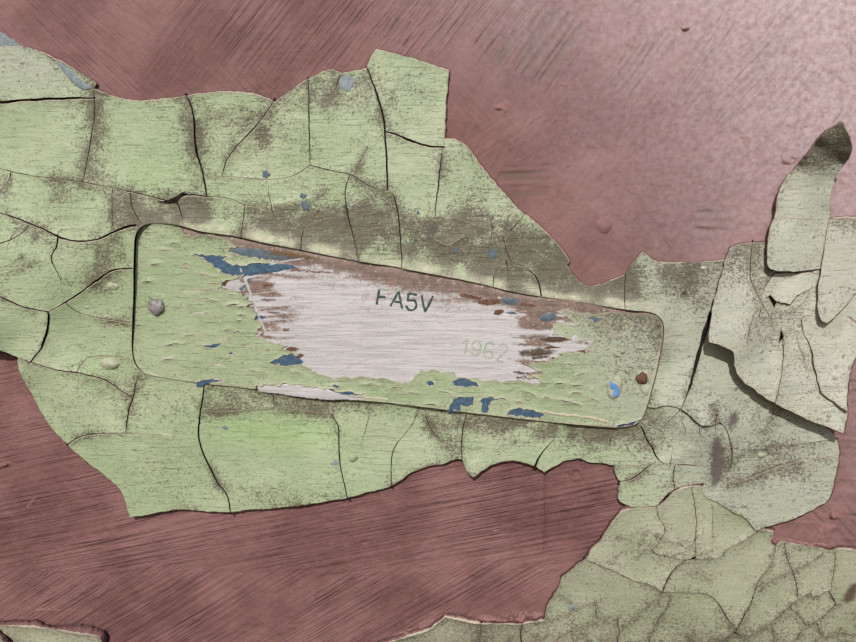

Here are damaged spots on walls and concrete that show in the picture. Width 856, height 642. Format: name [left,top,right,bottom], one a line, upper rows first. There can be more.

crack [345,68,445,267]
crack [0,93,325,434]
peeling [0,32,856,531]
crack [198,385,232,515]
crack [330,413,350,500]
crack [391,407,466,488]
crack [580,427,696,490]
crack [678,301,733,466]
peeling [0,619,107,642]
peeling [377,484,856,642]
crack [699,543,812,642]